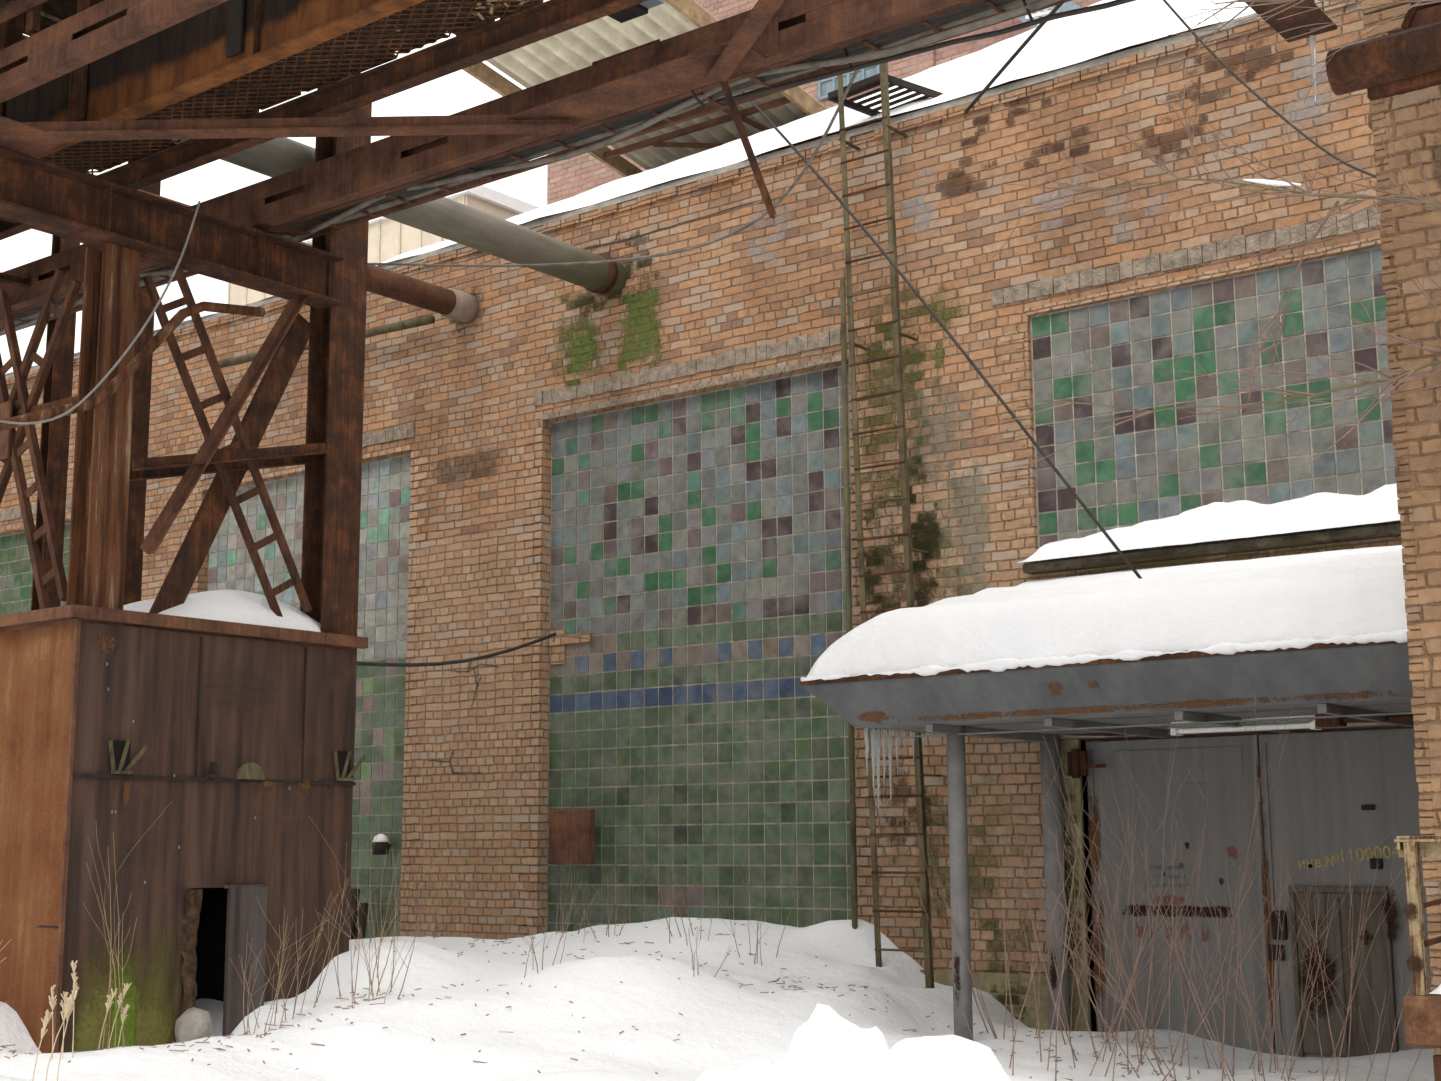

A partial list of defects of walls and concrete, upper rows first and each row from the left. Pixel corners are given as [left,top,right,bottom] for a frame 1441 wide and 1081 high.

spalling [936,115,997,197]
spalling [1004,96,1051,126]
spalling [1024,127,1090,167]
damp [554,297,599,387]
damp [617,289,661,369]
damp [862,326,945,503]
rust [1382,894,1417,942]
rust [1406,956,1424,971]